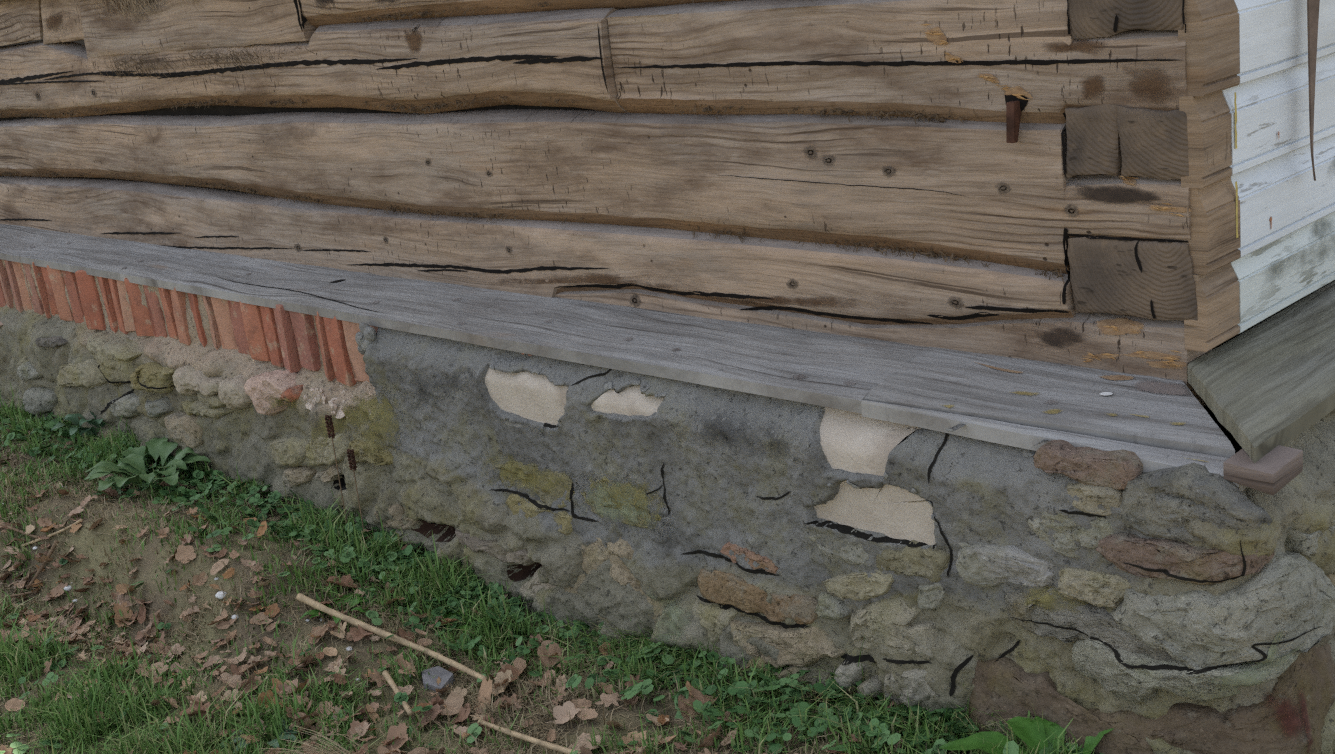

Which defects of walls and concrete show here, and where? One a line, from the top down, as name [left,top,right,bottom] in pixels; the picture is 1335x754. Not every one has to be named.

crack [0,15,1177,85]
crack [0,215,52,223]
crack [102,232,1068,324]
spalling [485,353,568,426]
spalling [591,378,666,416]
crack [491,477,599,522]
crack [758,491,791,500]
crack [804,433,952,577]
spalling [807,407,966,545]
crack [841,617,1323,697]